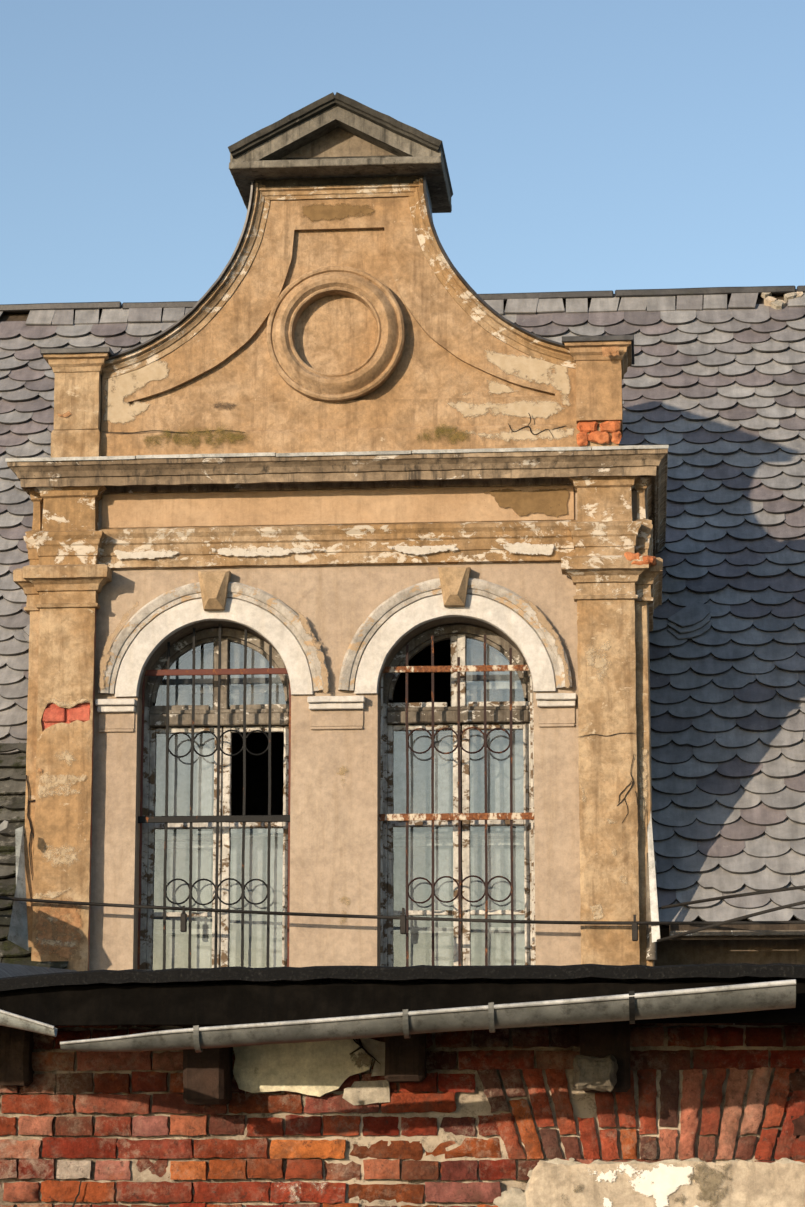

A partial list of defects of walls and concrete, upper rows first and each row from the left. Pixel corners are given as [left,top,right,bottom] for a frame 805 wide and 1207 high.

flaking render [103,361,169,424]
flaking render [448,351,622,446]
crack [508,413,565,436]
peeling [113,550,179,559]
peeling [212,546,325,557]
peeling [387,544,458,555]
peeling [500,542,554,555]
peeling [98,602,139,689]
flaking render [43,699,91,722]
crack [580,733,640,837]
peeling [342,1038,390,1105]
peeling [590,1163,694,1207]